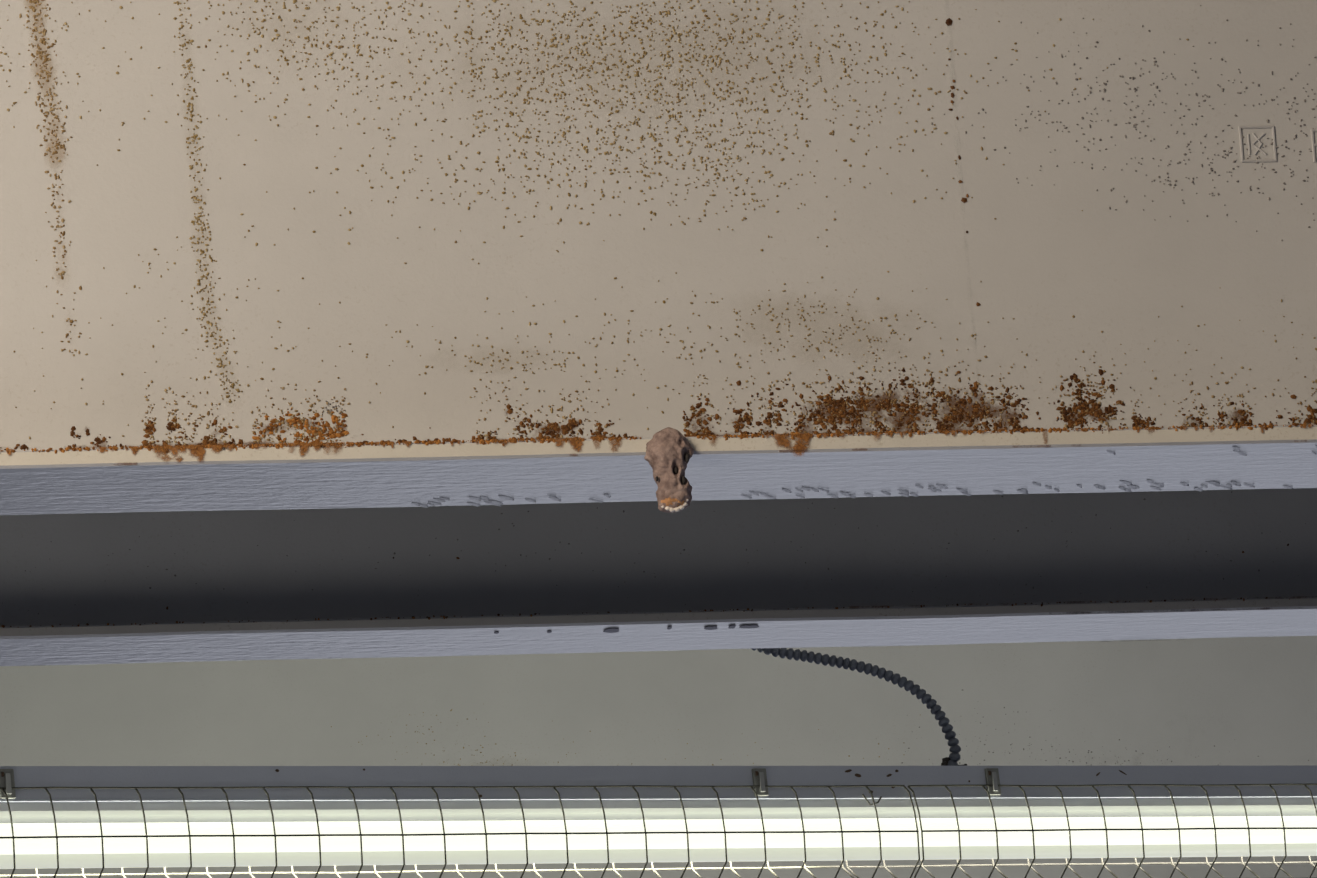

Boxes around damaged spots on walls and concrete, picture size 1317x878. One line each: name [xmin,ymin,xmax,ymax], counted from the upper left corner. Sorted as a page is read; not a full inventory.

rust [0,0,1317,465]